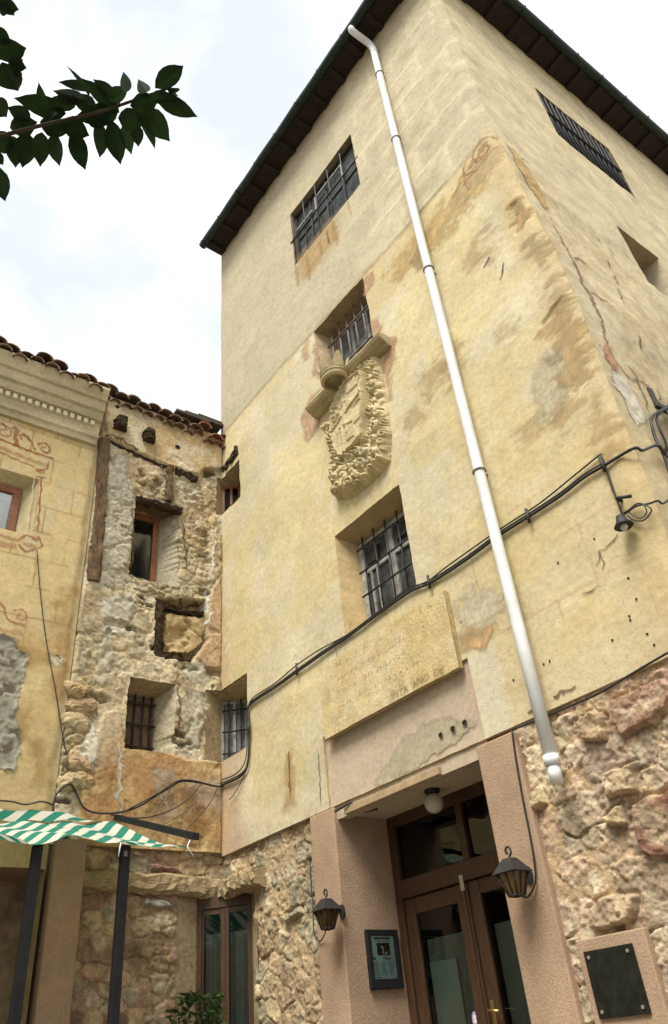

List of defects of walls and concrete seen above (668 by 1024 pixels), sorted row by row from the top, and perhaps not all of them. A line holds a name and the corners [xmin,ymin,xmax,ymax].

peeling [535,271,646,425]
crack [551,220,662,411]
peeling [0,633,30,771]
crack [114,742,125,824]